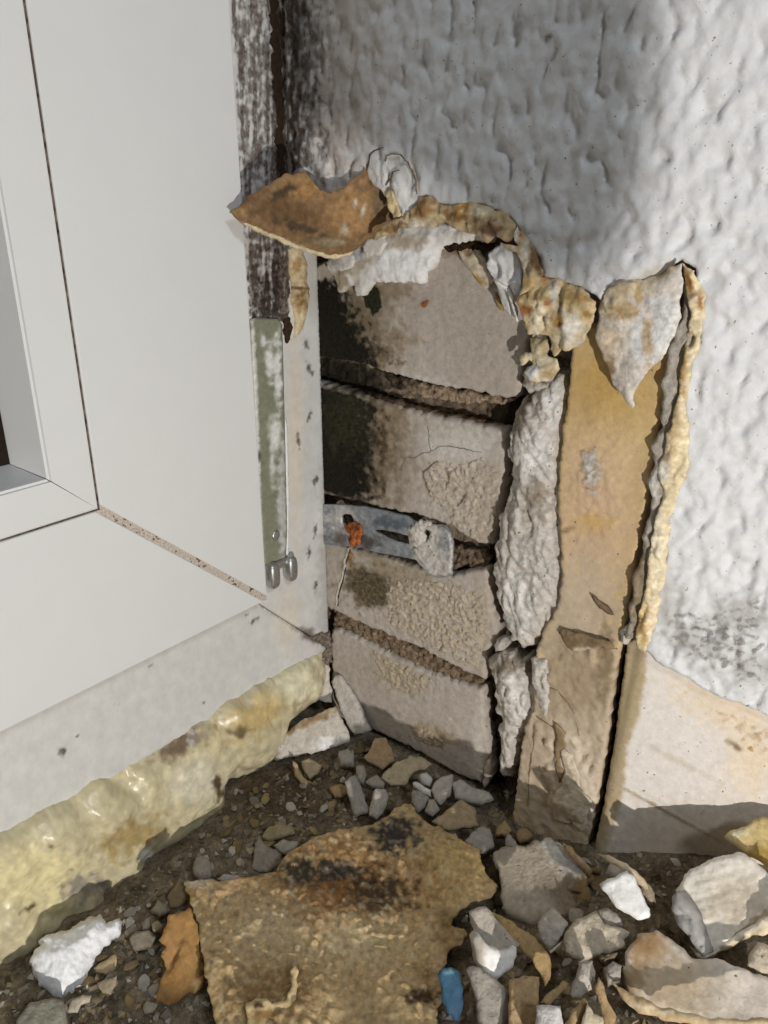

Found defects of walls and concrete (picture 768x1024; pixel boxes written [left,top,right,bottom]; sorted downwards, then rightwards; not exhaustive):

damp [232,0,330,202]
damp [244,225,290,321]
flaking render [326,222,497,296]
damp [318,278,403,368]
damp [321,388,387,500]
spalling [581,451,602,495]
spalling [625,282,693,639]
rust [344,522,363,570]
flaking render [385,350,571,788]